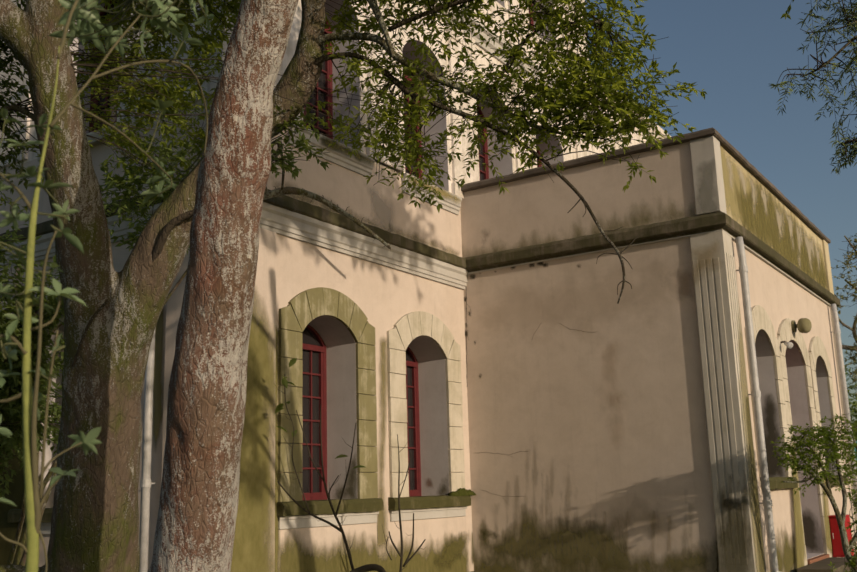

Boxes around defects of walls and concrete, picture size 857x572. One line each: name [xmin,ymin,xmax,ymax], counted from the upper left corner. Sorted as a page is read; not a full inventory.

leakage [727,158,819,264]
leakage [434,534,466,567]
leakage [719,499,750,572]